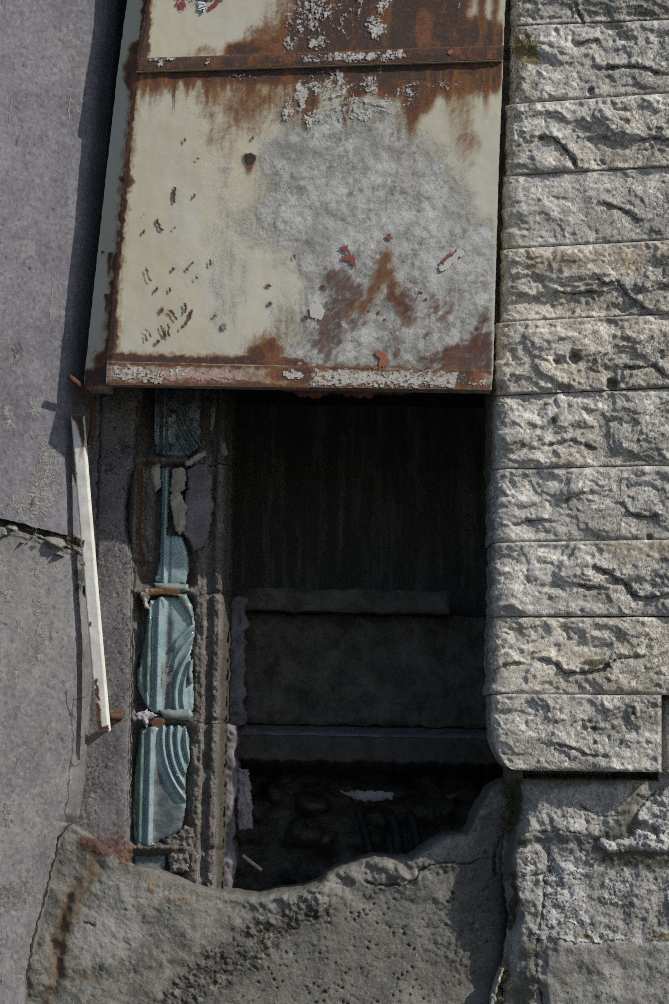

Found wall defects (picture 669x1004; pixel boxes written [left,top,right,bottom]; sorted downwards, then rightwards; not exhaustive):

peeling [282,0,461,129]
corrosion [84,0,503,389]
corrosion [79,830,133,866]
crack [364,839,499,886]
crack [520,804,622,1004]